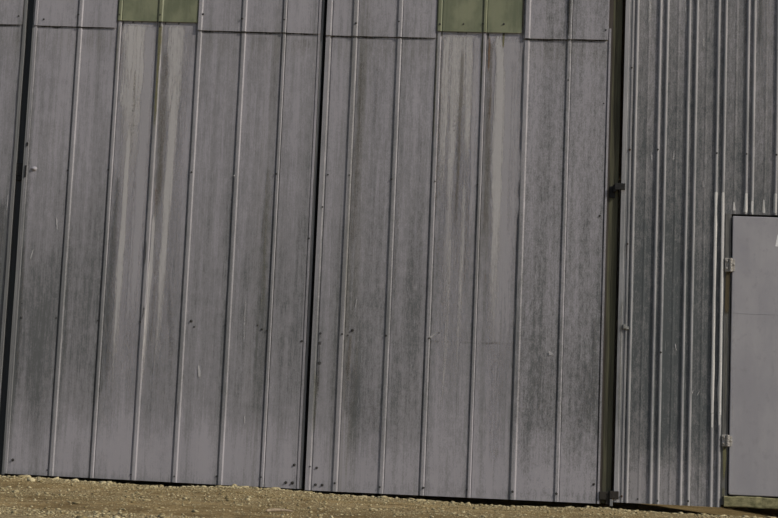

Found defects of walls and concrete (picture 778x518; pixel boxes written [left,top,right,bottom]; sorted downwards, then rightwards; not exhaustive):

damp [105,21,189,368]
damp [430,0,571,452]